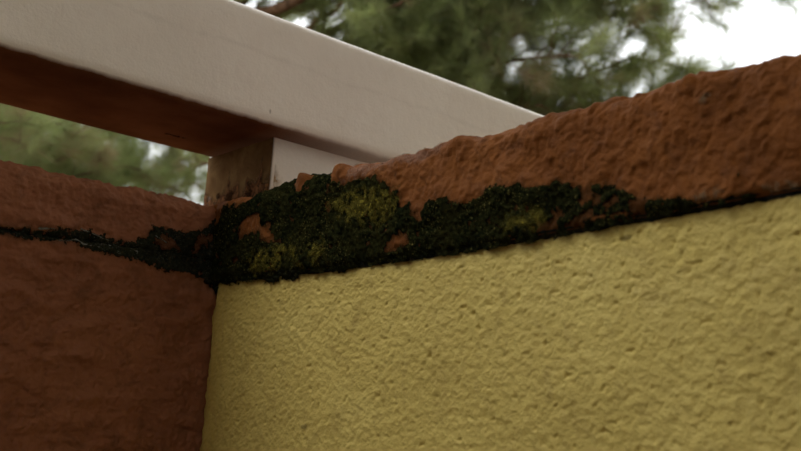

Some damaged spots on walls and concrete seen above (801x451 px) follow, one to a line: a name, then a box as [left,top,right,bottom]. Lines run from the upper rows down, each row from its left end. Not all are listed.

crack [0,218,216,289]
leakage [205,137,757,285]